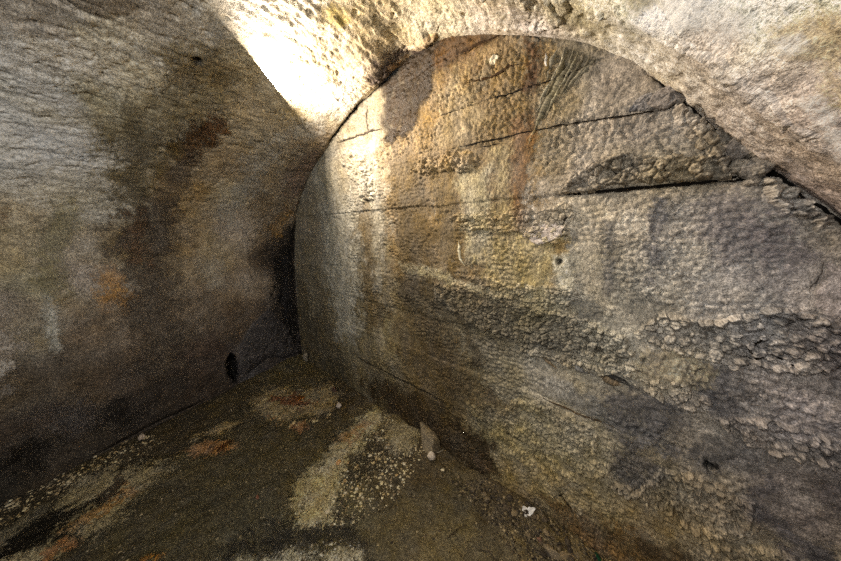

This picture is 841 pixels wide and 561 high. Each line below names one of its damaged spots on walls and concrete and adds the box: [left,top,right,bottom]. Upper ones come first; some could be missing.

crack [415,35,499,76]
leakage [380,34,491,147]
crack [437,63,591,117]
crack [451,102,718,149]
leakage [88,40,242,379]
corrosion [379,34,569,300]
crack [558,151,743,196]
crack [763,170,841,225]
leakage [29,197,82,351]
leakage [219,115,524,561]
crack [723,319,814,367]